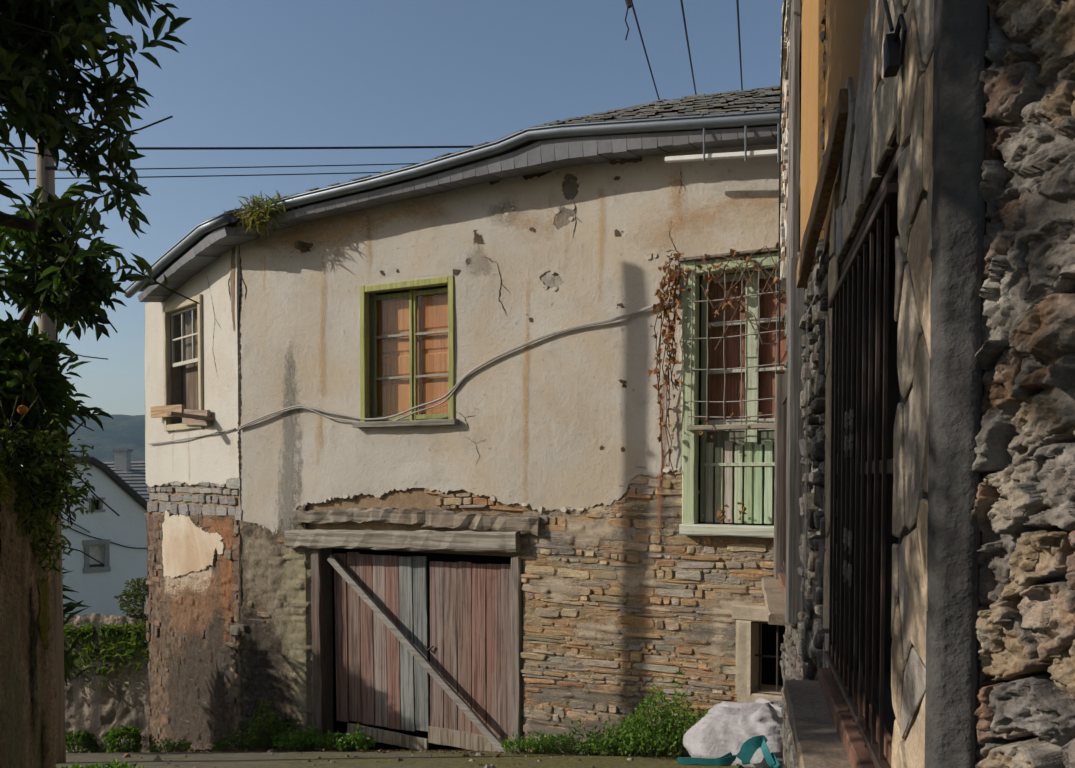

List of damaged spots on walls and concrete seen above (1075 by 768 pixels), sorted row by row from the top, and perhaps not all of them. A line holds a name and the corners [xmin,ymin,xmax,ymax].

peeling [453,230,488,276]
crack [485,257,511,316]
spalling [540,271,564,291]
spalling [553,173,581,230]
damp [278,355,302,532]
damp [29,578,51,768]
flaking render [162,504,314,751]
spalling [424,466,774,755]